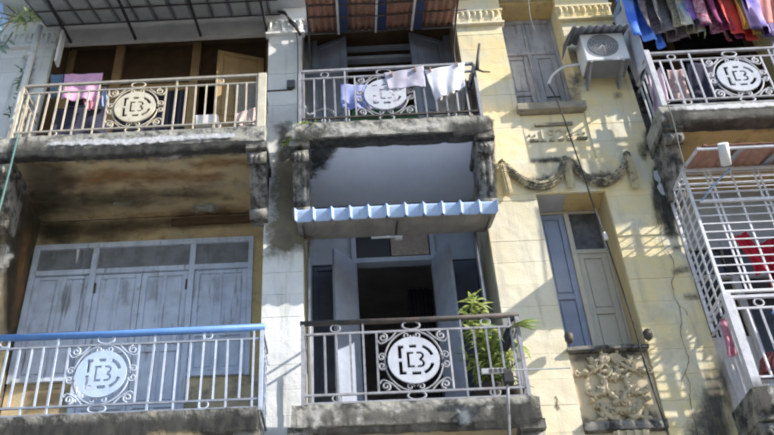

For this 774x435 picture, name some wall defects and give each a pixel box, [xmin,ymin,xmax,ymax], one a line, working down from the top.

damp [6,60,256,215]
damp [44,220,171,239]
damp [266,118,494,255]
mould [653,166,678,237]
crack [660,221,696,426]
damp [0,410,264,435]
damp [307,399,537,435]
damp [689,362,731,435]